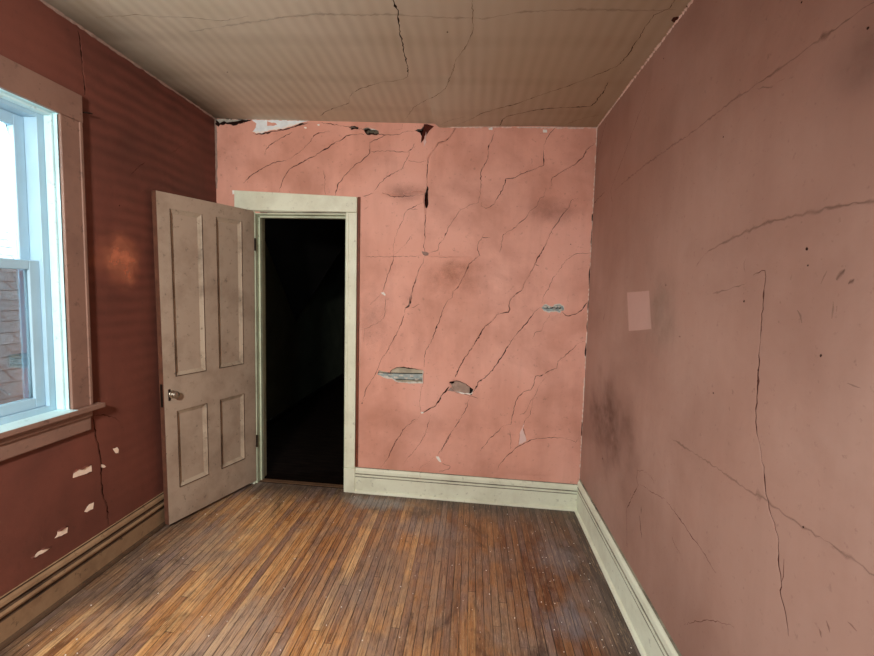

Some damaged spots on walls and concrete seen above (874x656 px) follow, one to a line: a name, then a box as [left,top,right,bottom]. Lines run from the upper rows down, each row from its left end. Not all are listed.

peeling [215,119,320,135]
crack [243,0,675,405]
spalling [542,304,564,313]
crack [388,192,605,472]
spalling [378,367,424,384]
spalling [447,380,476,398]
crack [753,270,788,635]
peeling [73,464,106,478]
crack [91,414,120,525]
peeling [32,526,68,559]